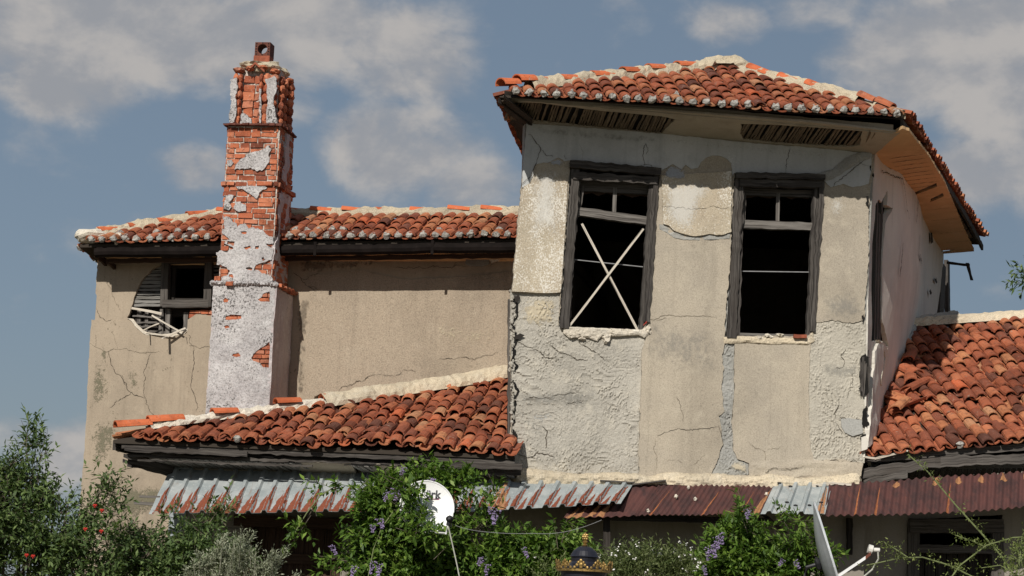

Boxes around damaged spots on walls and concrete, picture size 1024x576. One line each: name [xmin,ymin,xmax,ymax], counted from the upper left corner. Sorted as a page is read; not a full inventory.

peeling [229,76,278,124]
peeling [214,133,292,302]
spalling [659,171,732,240]
crack [97,279,156,415]
spalling [127,266,212,339]
crack [186,335,210,407]
spalling [507,181,568,458]
crack [517,341,604,360]
crack [653,398,723,468]